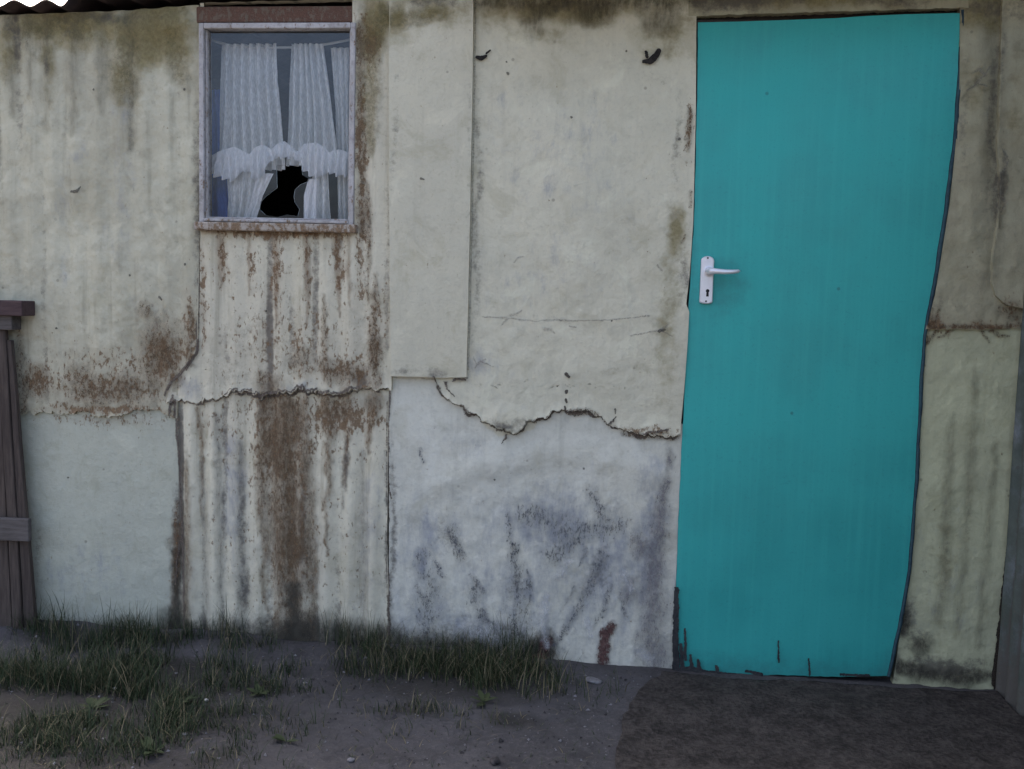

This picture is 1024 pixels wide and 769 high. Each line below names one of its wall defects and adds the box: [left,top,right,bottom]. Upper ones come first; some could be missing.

rust [320,23,382,444]
crack [423,0,678,444]
rust [256,371,349,632]
water stain [221,489,628,658]
water stain [896,640,992,685]